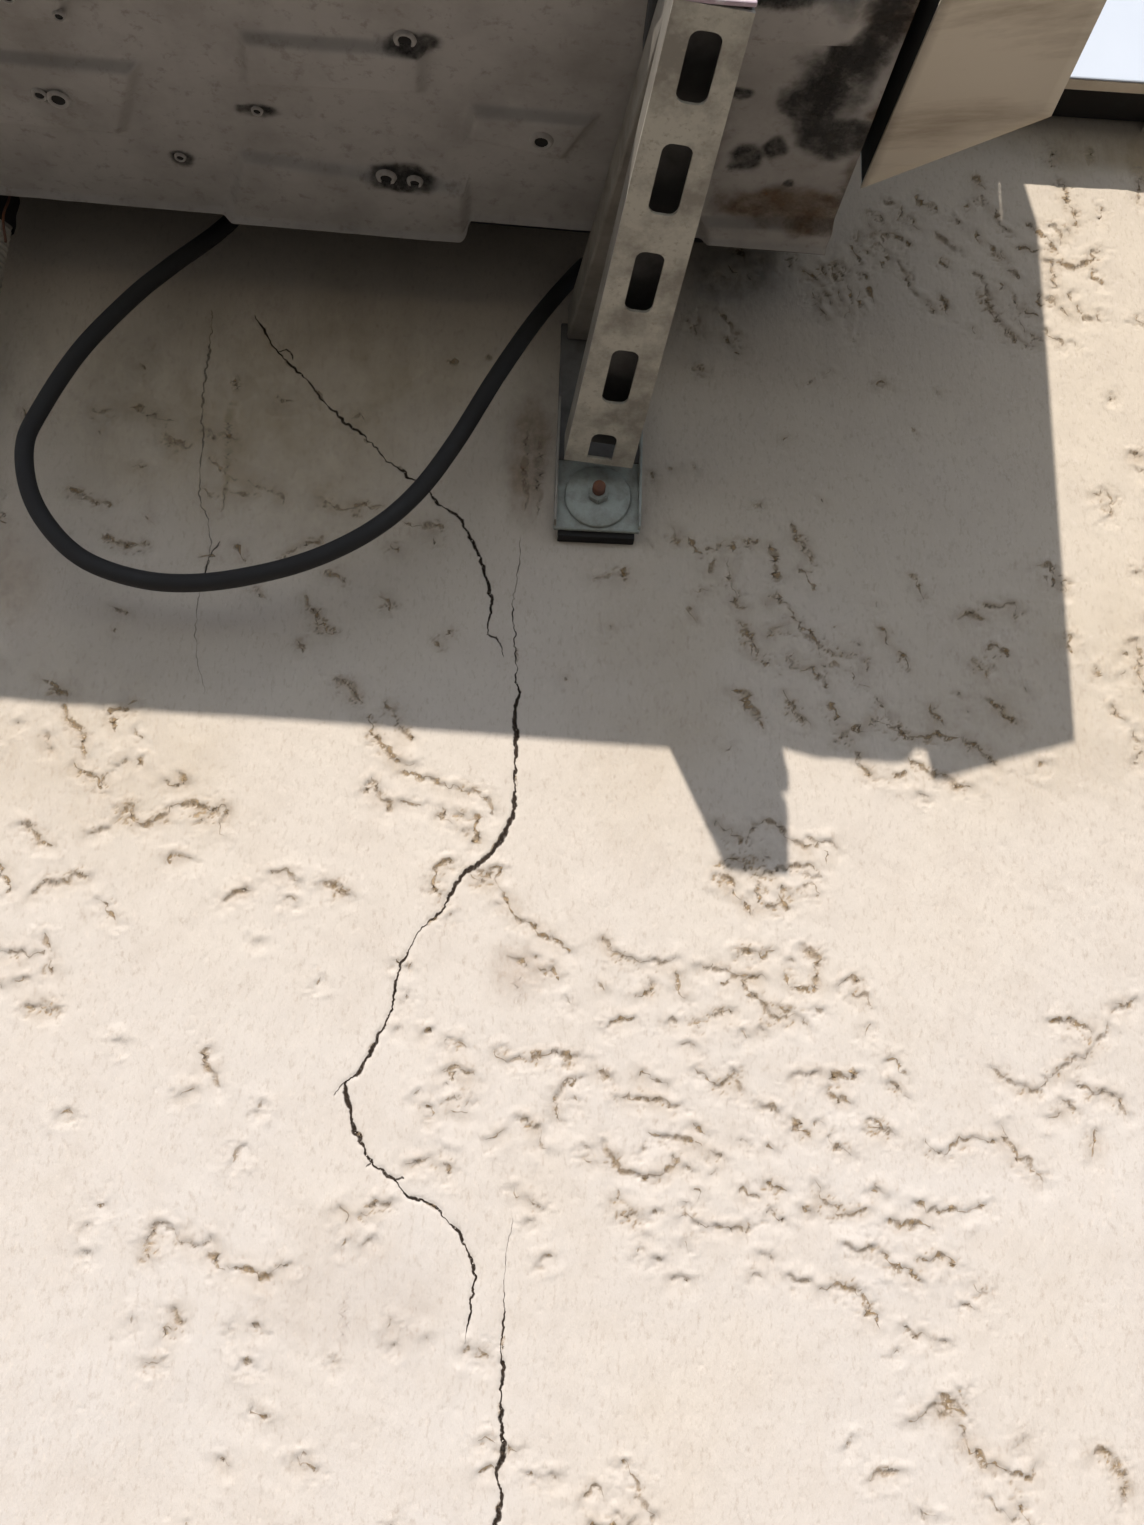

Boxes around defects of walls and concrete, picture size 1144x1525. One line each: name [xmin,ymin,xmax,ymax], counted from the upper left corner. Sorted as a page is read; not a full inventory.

crack [255,316,521,1525]